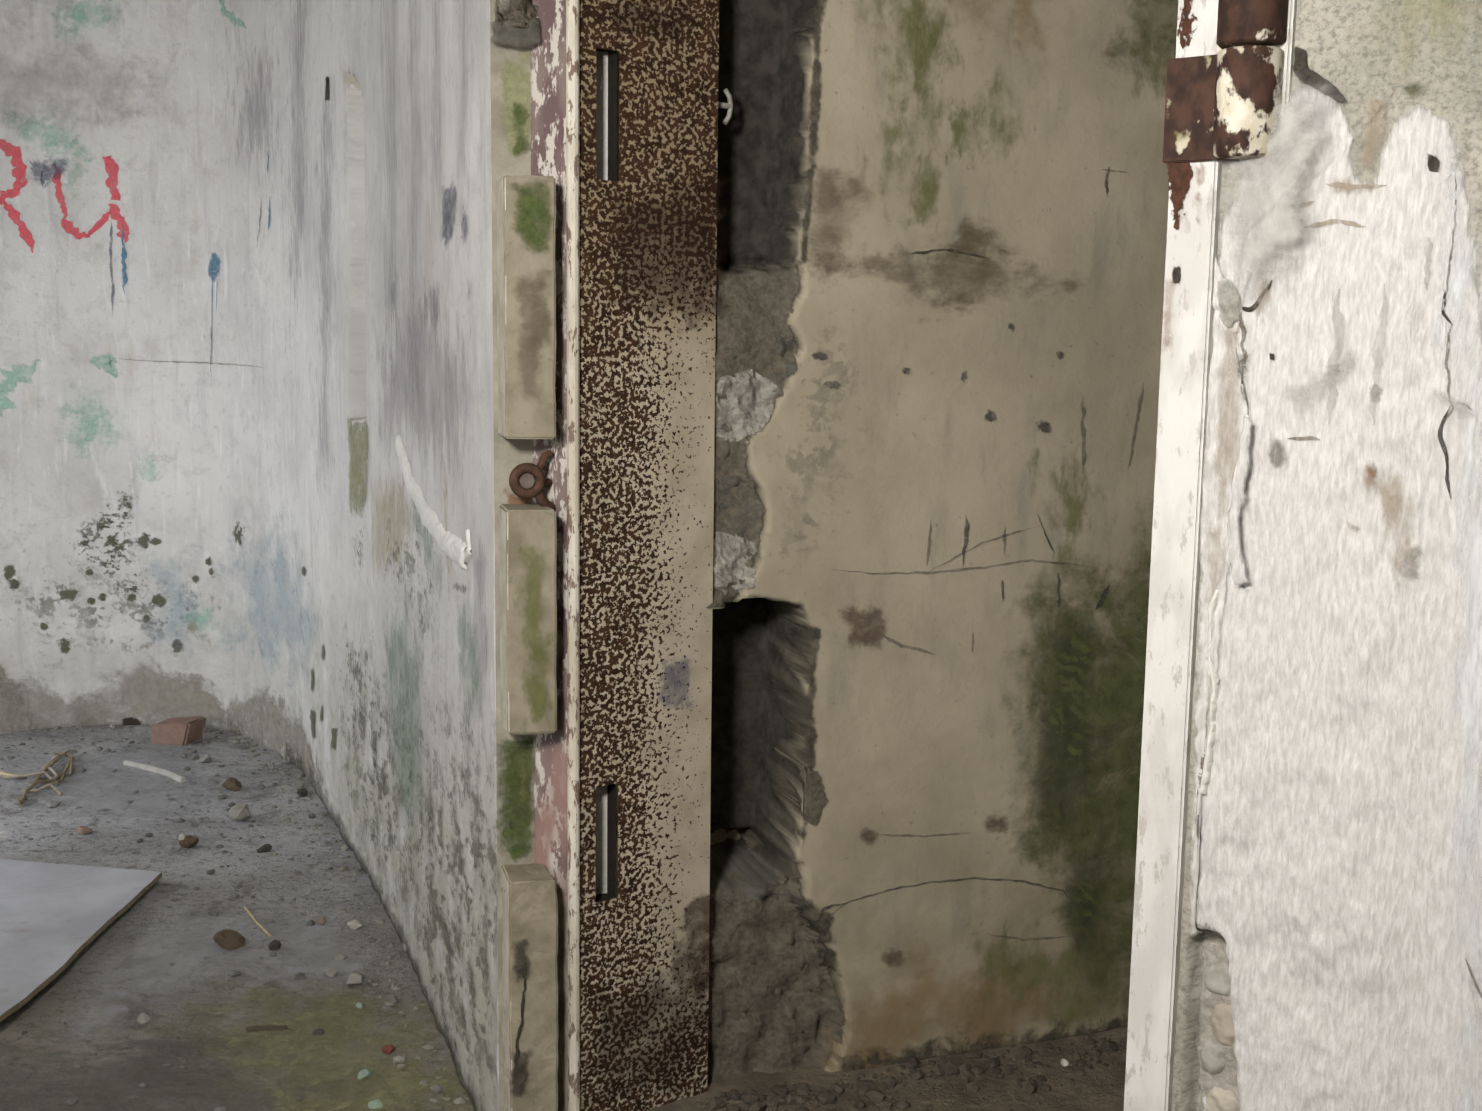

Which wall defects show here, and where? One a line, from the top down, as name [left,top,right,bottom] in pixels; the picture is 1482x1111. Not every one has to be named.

corrosion [1177,0,1198,49]
spalling [706,0,826,608]
damp [901,227,998,298]
corrosion [1167,162,1193,230]
crack [1438,162,1472,499]
mould [4,491,194,653]
spalling [774,623,828,839]
damp [0,652,495,1067]
spalling [708,823,846,1083]